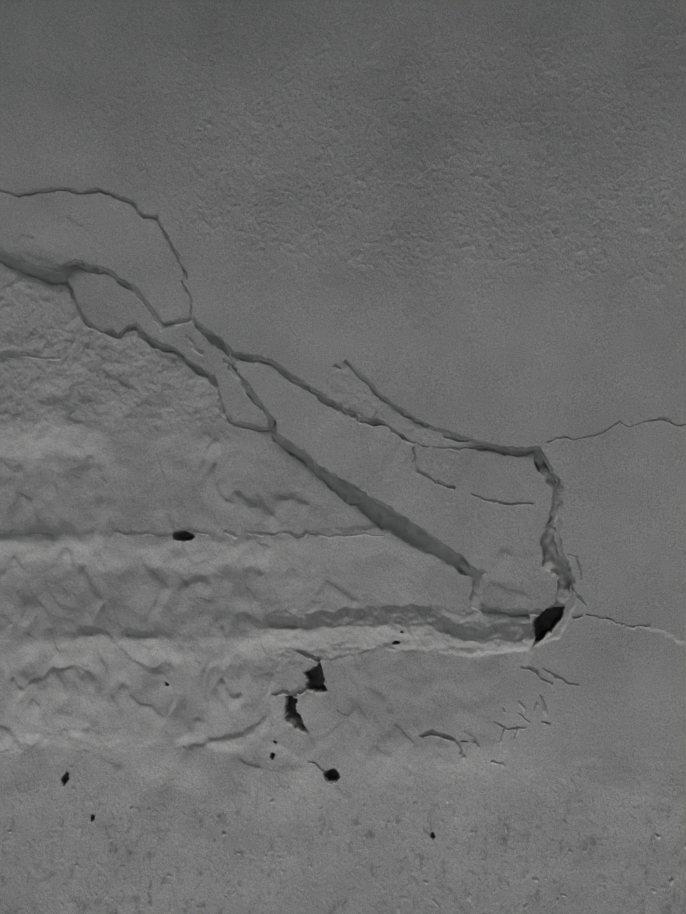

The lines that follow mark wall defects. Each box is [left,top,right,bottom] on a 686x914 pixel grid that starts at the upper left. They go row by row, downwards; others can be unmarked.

spalling [0,247,535,760]
crack [0,189,686,766]